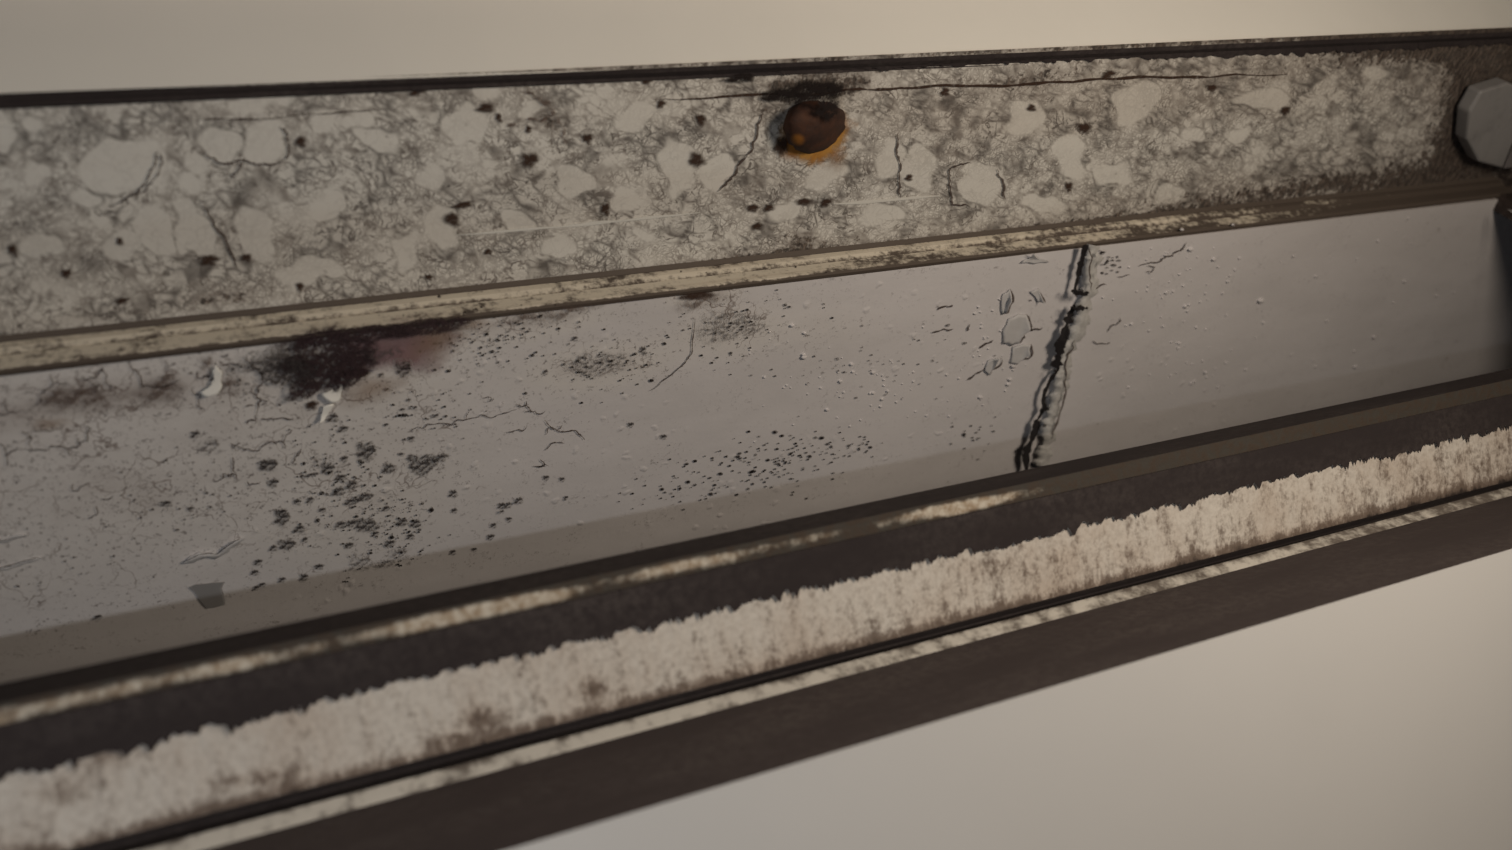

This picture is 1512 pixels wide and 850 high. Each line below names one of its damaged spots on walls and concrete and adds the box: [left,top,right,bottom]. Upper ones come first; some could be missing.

corrosion [774,129,847,164]
leakage [120,289,791,590]
crack [1022,242,1187,470]
leakage [0,425,1512,850]